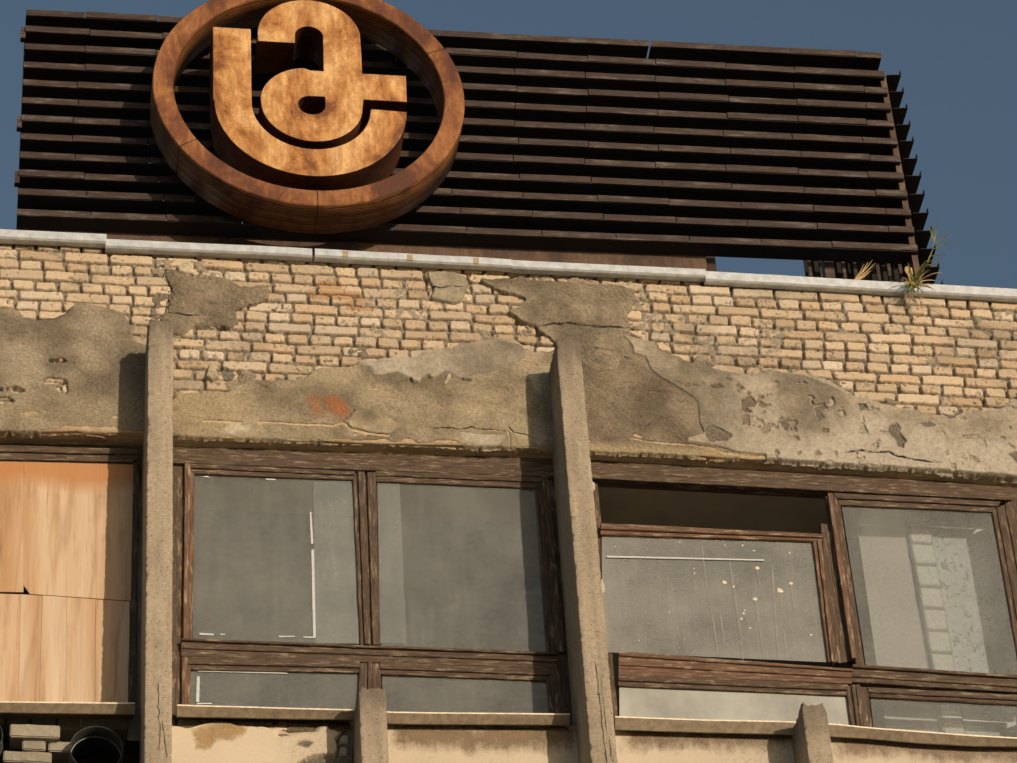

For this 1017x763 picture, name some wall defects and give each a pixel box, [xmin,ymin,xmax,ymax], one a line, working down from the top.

crack [521,322,630,359]
flaking render [173,271,1017,483]
crack [432,426,537,451]
crack [847,449,933,463]
spalling [172,714,354,763]